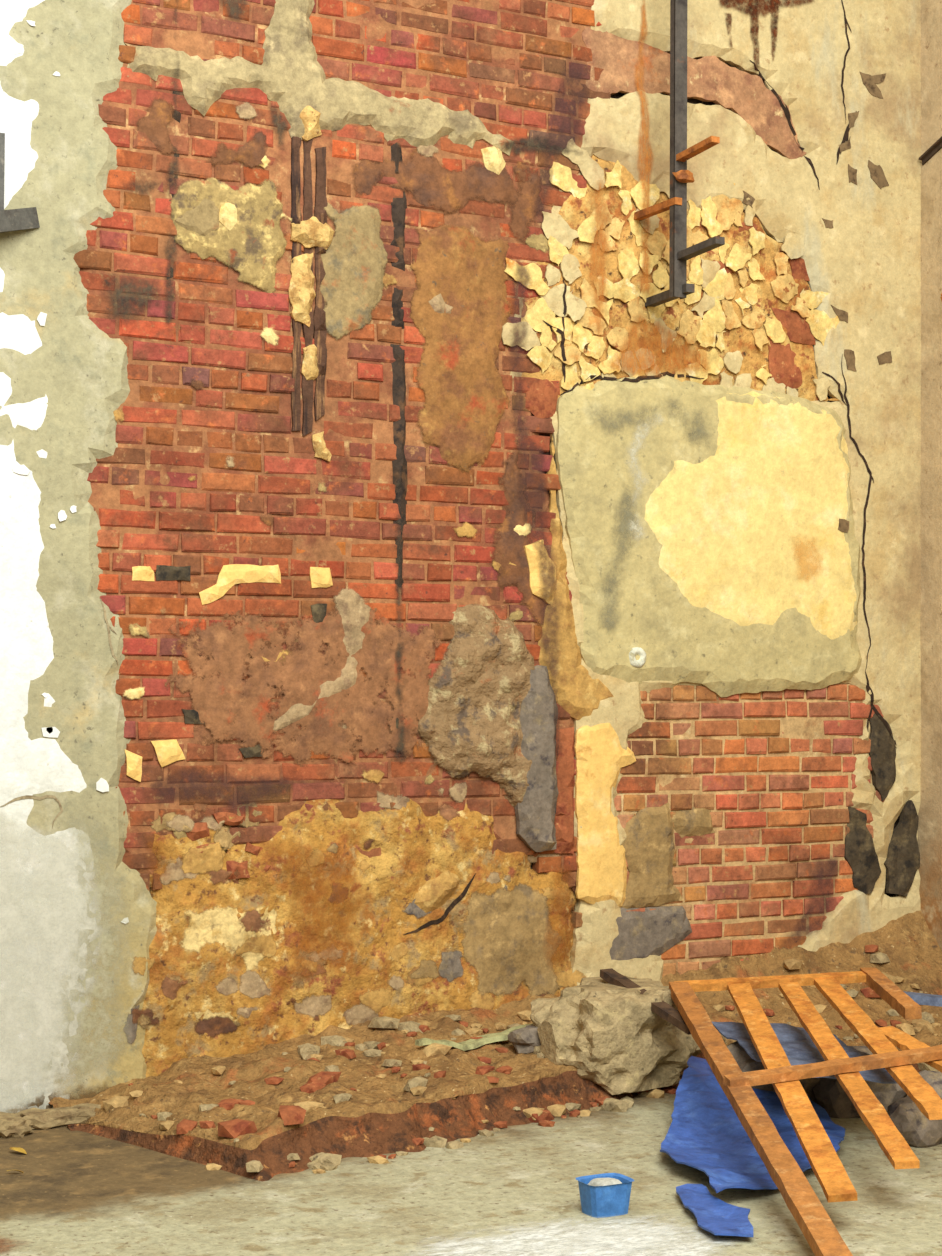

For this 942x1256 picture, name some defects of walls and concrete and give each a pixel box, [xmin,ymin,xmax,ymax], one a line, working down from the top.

peeling [0,85,39,209]
peeling [0,0,45,66]
crack [750,0,857,190]
peeling [0,312,47,355]
peeling [0,372,48,430]
spalling [73,0,920,1078]
peeling [0,441,101,1112]